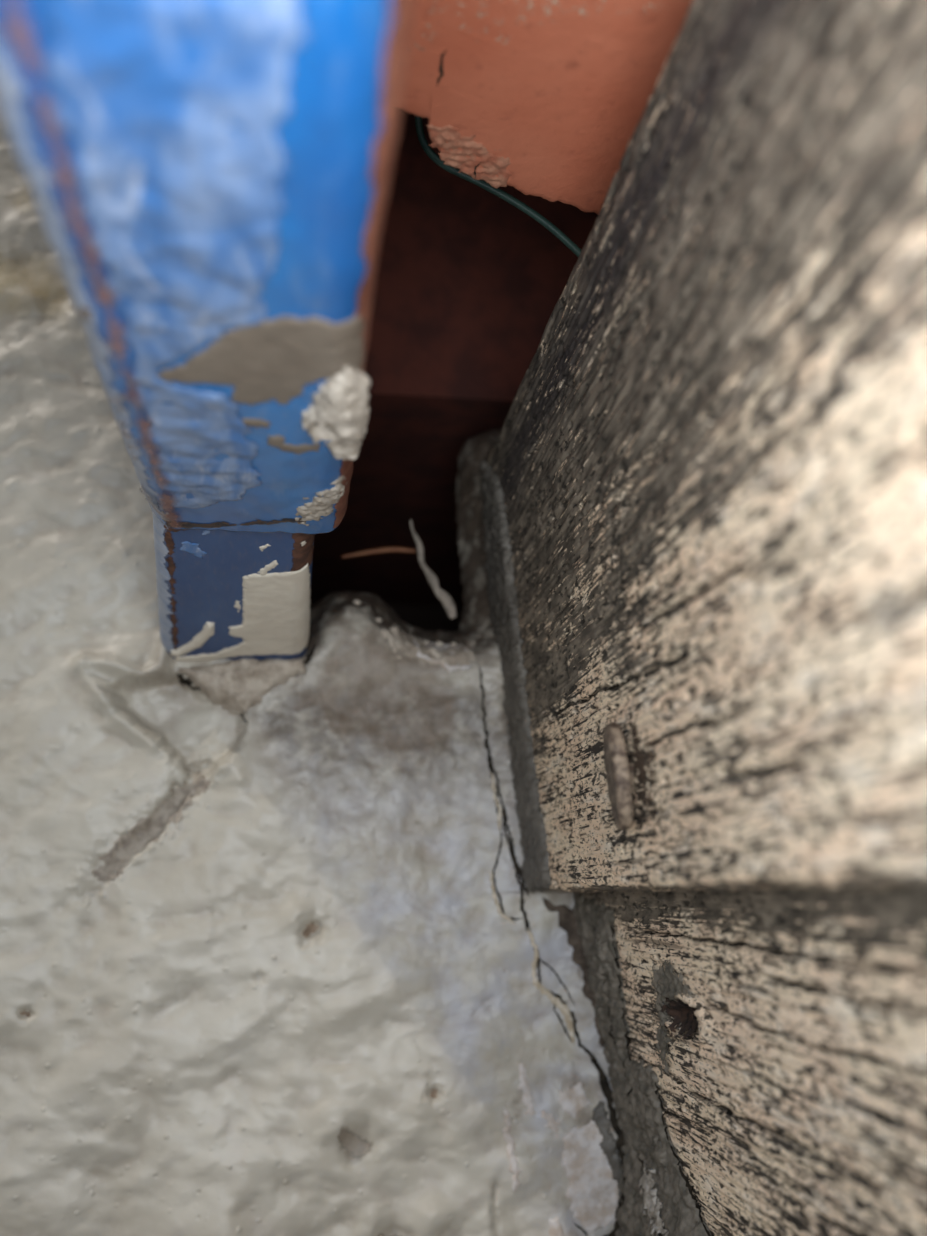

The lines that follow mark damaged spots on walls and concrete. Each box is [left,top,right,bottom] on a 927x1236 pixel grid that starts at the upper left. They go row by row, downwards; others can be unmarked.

spalling [426,124,512,189]
peeling [295,475,348,526]
crack [479,667,644,1236]